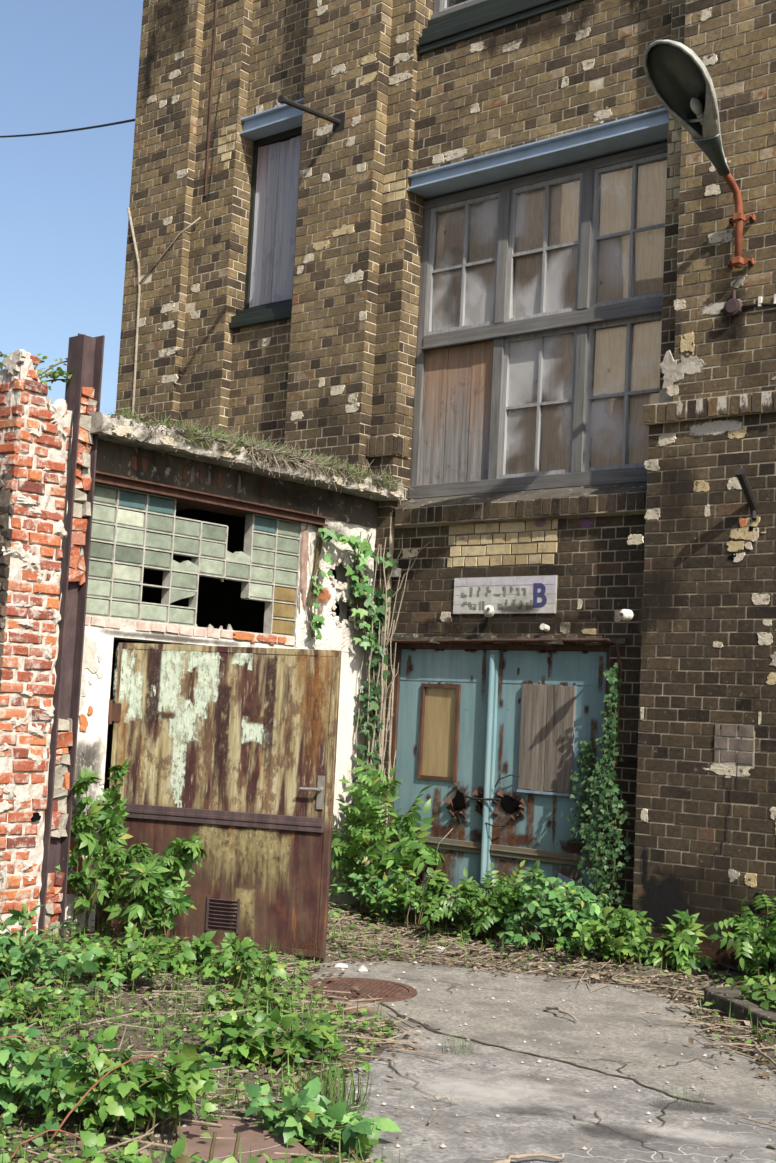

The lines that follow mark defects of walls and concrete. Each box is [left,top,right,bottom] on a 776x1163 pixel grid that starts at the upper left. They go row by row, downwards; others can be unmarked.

leakage [145,34,155,87]
flaking render [680,332,706,365]
spalling [666,385,679,397]
spalling [726,517,766,563]
spalling [330,557,354,627]
corrosion [144,648,175,728]
peeling [74,631,286,808]
corrosion [213,686,231,786]
corrosion [246,656,277,757]
corrosion [465,649,556,707]
corrosion [414,788,593,887]
crack [342,1002,730,1158]